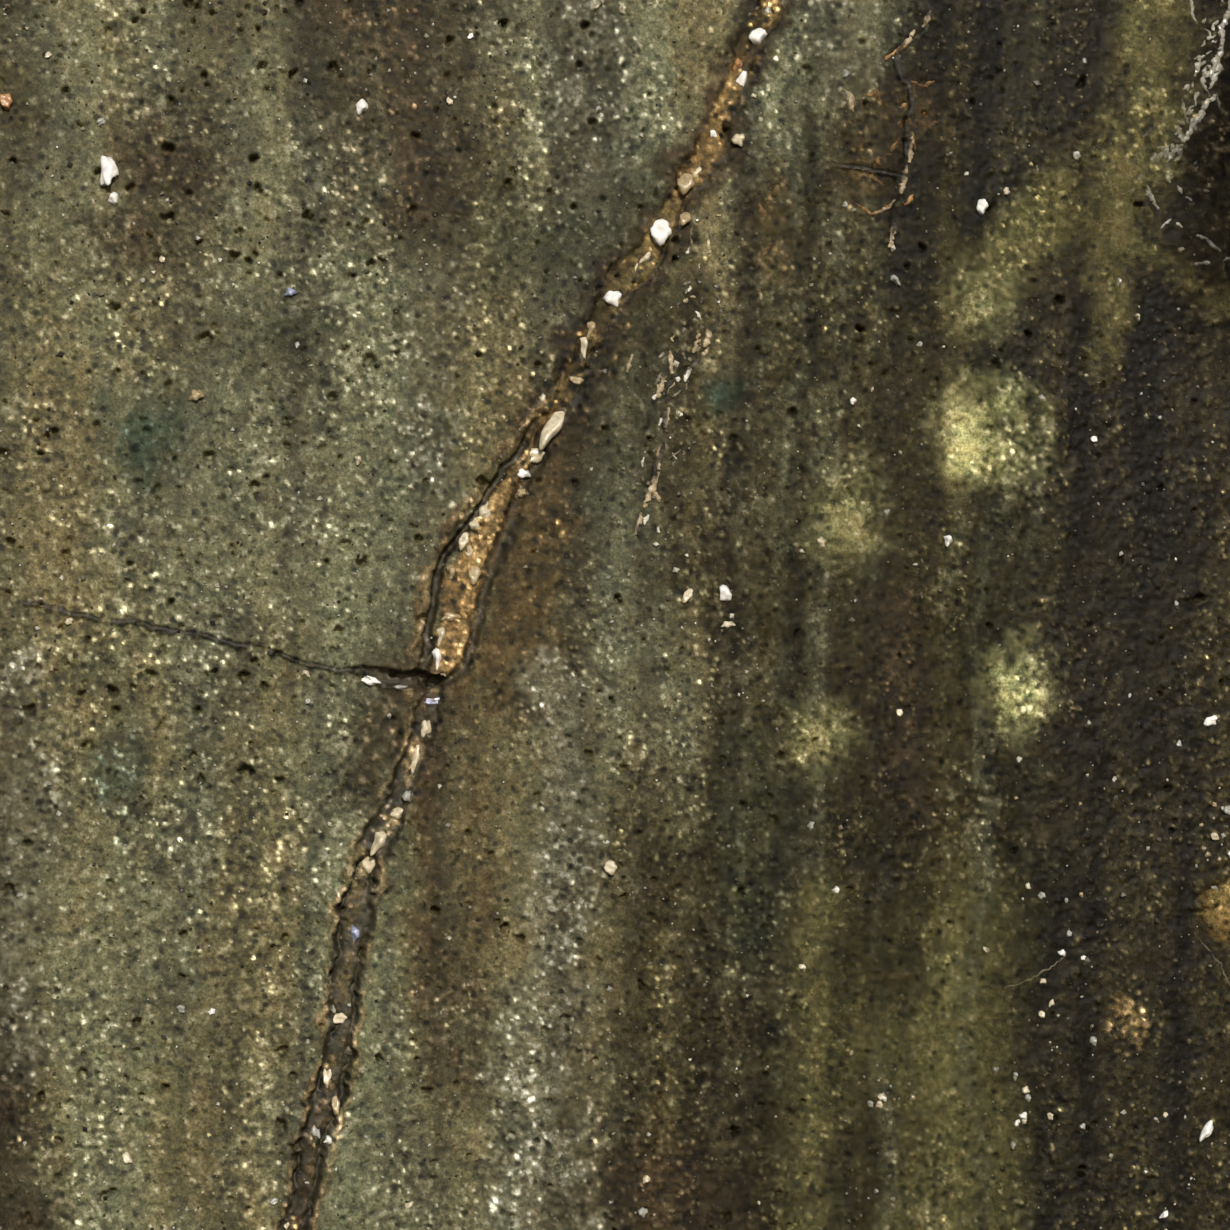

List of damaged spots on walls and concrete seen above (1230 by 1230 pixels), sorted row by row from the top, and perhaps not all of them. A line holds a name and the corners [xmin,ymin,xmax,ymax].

damp [560,0,613,125]
crack [834,2,939,248]
crack [22,0,786,1230]
damp [605,0,1230,1230]
damp [408,653,597,1230]